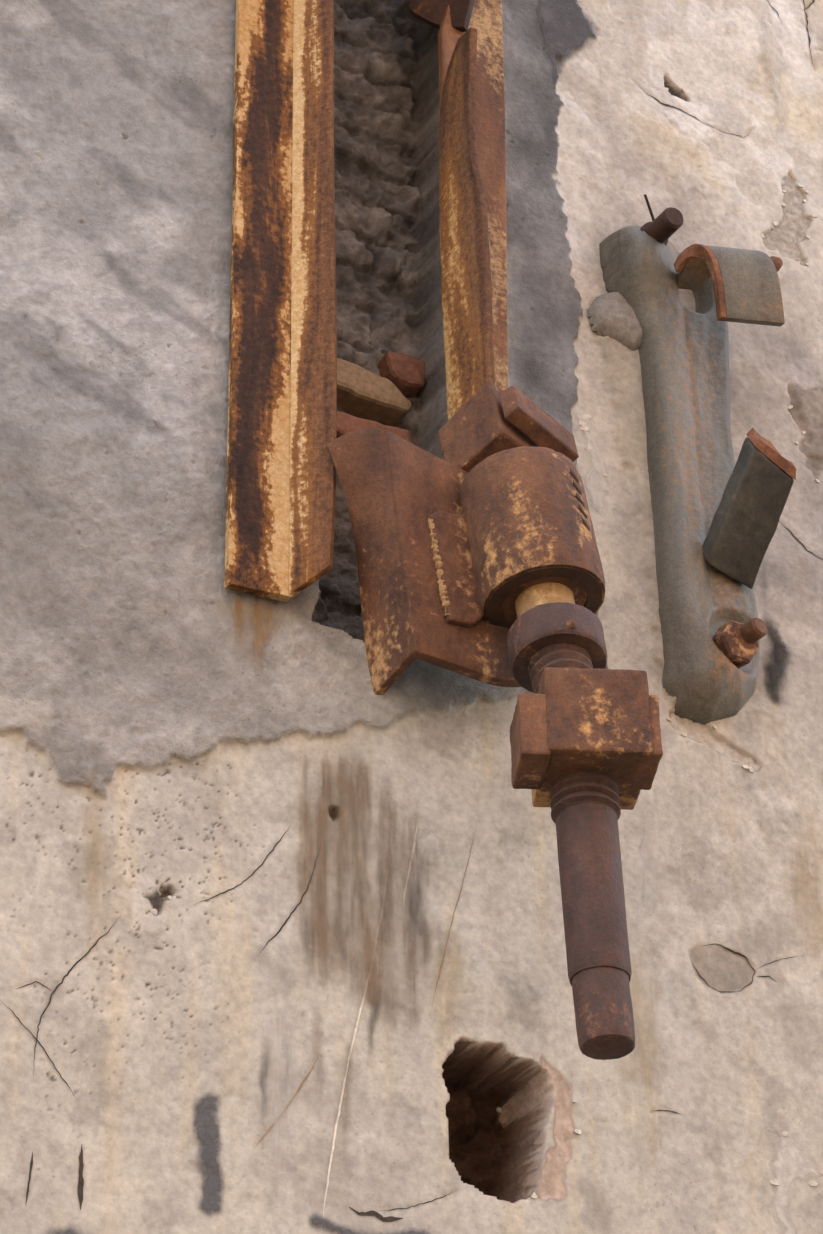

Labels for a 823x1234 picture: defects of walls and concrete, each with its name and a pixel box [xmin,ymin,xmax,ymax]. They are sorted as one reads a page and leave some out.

crack [633,79,750,138]
crack [767,0,816,68]
crack [779,521,822,559]
corrosion [303,769,358,959]
crack [4,920,117,1099]
spalling [442,1041,582,1203]